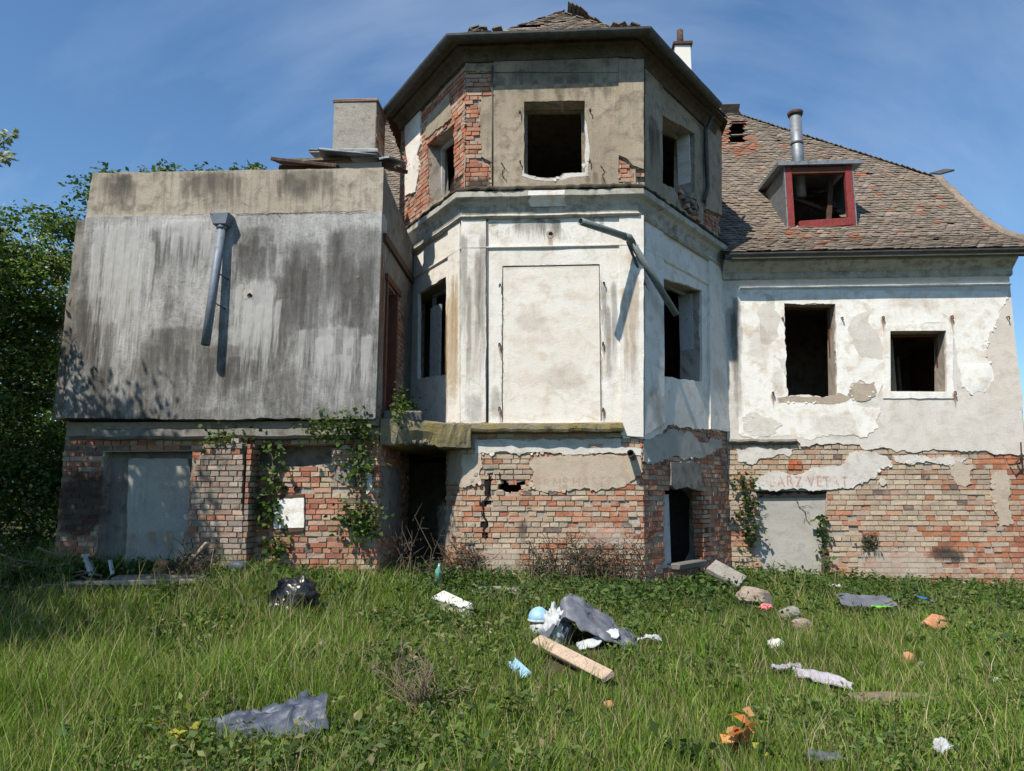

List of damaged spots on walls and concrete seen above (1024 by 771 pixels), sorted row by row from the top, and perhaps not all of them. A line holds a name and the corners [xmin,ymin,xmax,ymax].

flaking render [404,111,422,196]
flaking render [463,69,495,187]
flaking render [618,160,645,186]
peeling [962,295,1023,410]
flaking render [742,412,782,437]
flaking render [848,382,876,402]
spalling [788,460,802,469]
crack [481,472,501,538]
spalling [470,472,548,538]